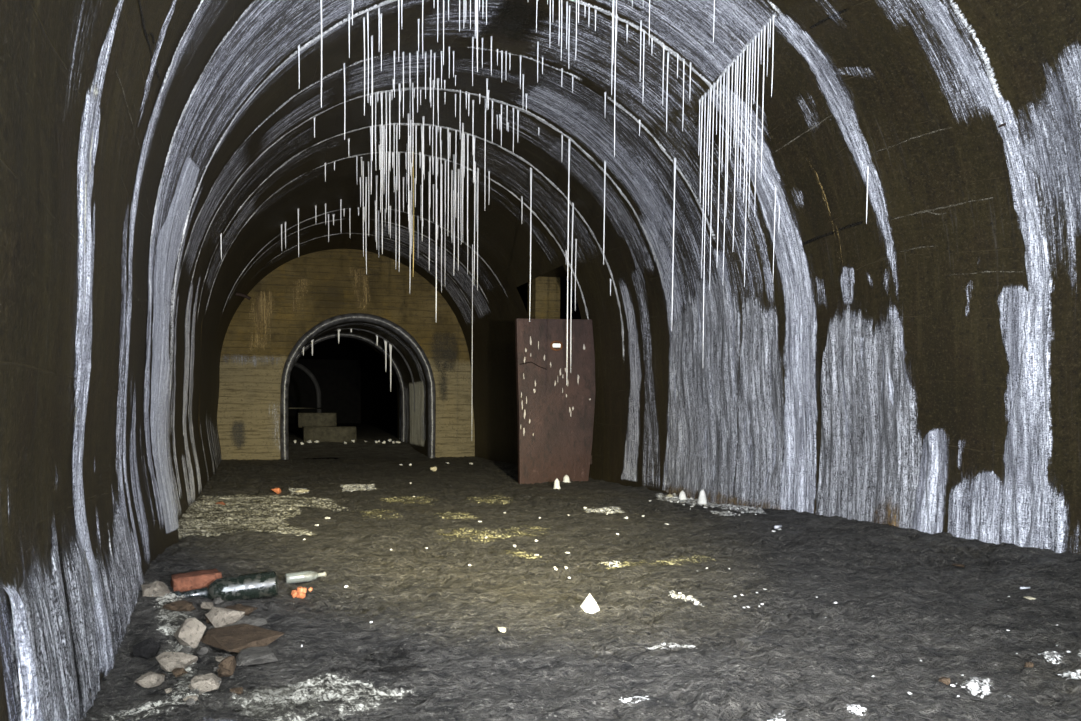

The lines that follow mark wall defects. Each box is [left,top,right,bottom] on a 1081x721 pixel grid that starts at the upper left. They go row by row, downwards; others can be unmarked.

water stain [70,0,124,673]
water stain [112,0,898,565]
water stain [882,0,1081,548]
water stain [59,545,84,720]
water stain [101,592,209,721]
water stain [230,646,419,721]
water stain [601,555,714,569]